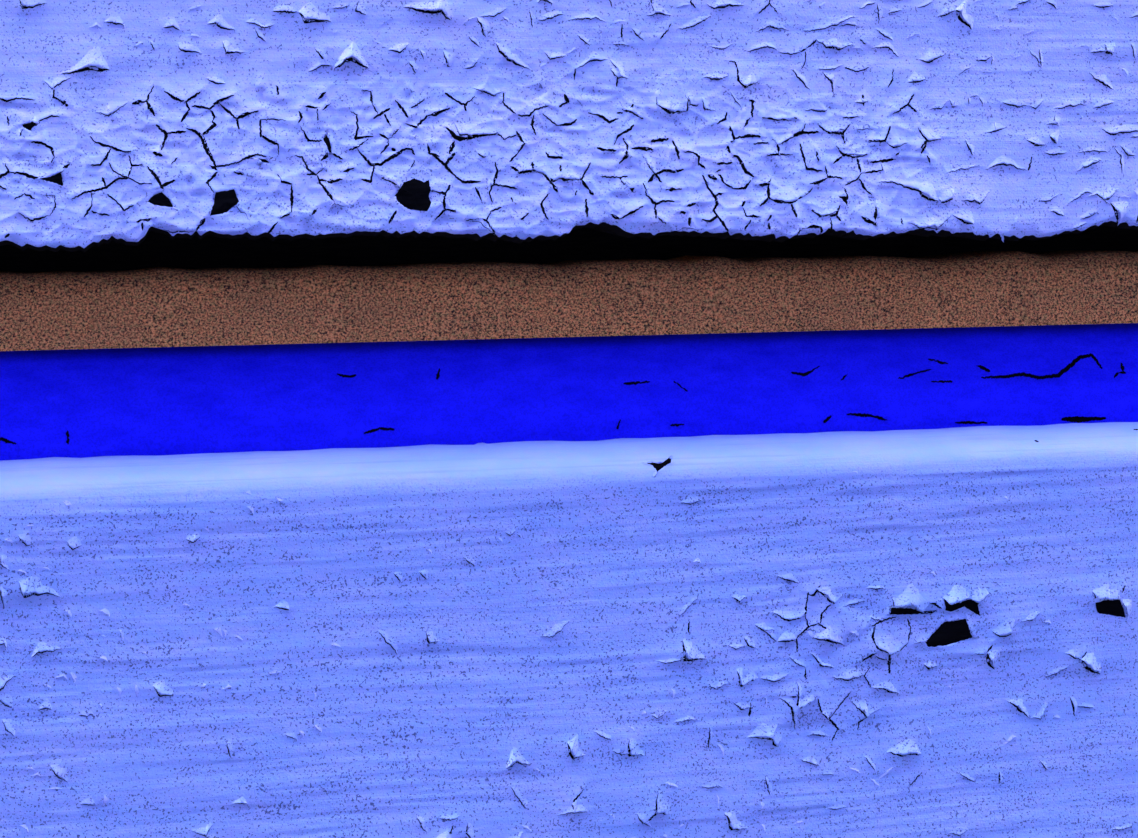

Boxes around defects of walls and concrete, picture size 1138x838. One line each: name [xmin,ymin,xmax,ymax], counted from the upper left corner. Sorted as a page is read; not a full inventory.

peeling [207,0,368,54]
peeling [747,0,974,58]
crack [0,40,937,238]
peeling [440,120,500,147]
peeling [1002,72,1138,175]
peeling [140,186,194,233]
peeling [205,184,251,222]
peeling [384,172,438,218]
peeling [816,582,1040,670]
peeling [1090,584,1132,621]
peeling [707,626,865,736]
crack [792,586,911,741]